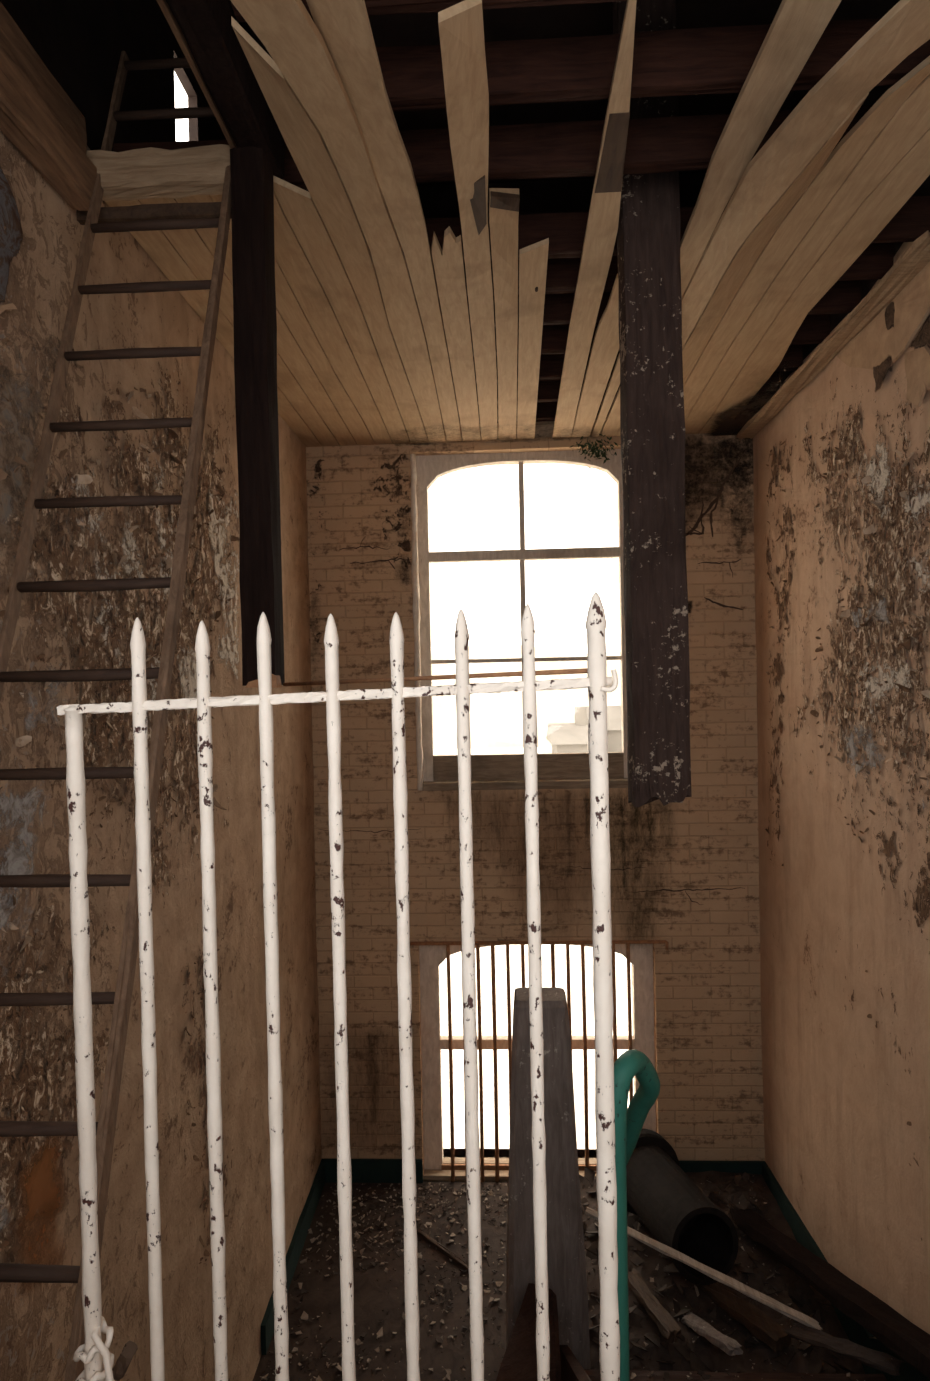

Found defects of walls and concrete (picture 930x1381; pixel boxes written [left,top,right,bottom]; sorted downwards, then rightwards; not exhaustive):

flaking render [0,166,23,314]
peeling [0,361,239,1264]
peeling [765,261,930,954]